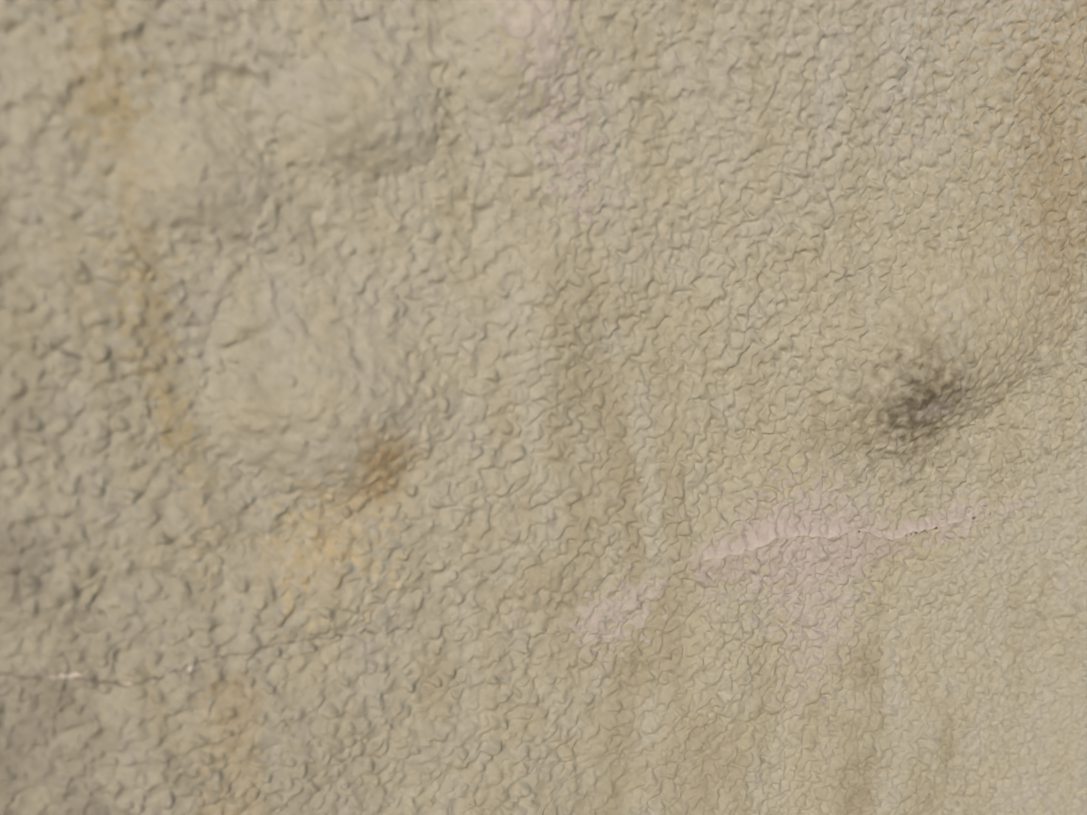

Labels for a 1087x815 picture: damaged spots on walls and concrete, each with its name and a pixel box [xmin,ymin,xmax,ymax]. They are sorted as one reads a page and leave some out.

crack [667,435,1039,749]